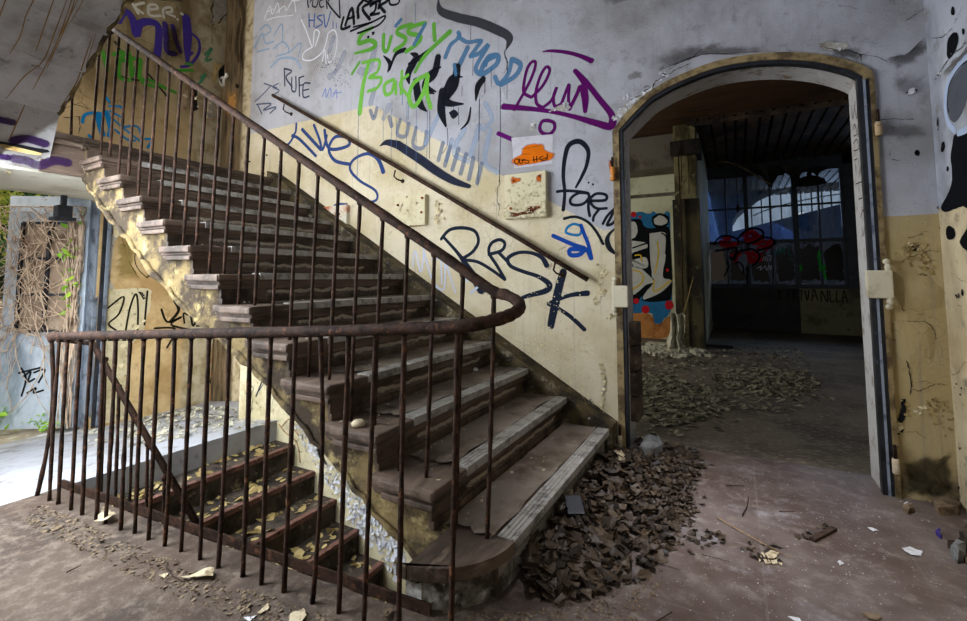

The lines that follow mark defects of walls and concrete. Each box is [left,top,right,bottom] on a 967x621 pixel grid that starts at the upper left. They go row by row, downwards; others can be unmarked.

water stain [167,29,181,57]
peeling [613,88,653,120]
crack [891,305,967,394]
water stain [908,456,951,494]